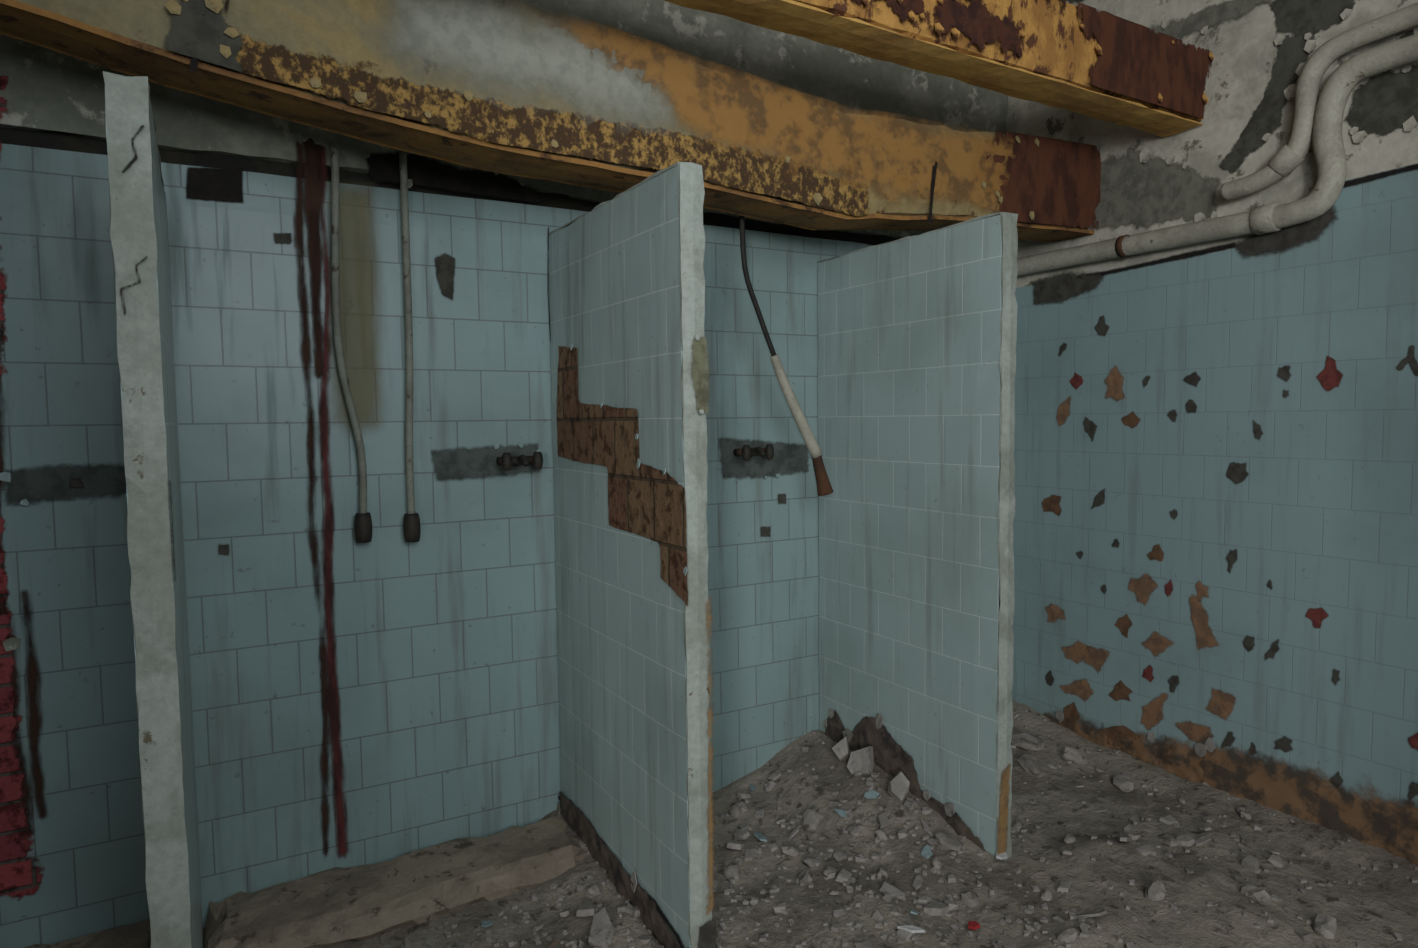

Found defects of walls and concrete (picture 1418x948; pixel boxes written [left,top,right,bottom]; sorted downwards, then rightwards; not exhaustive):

peeling [1344,64,1418,143]
peeling [1056,373,1097,441]
peeling [1105,367,1140,428]
peeling [1167,372,1201,422]
peeling [1317,356,1343,391]
peeling [431,343,688,606]
peeling [1226,462,1249,484]
peeling [1042,495,1061,516]
peeling [1128,545,1173,605]
peeling [1189,581,1219,650]
peeling [1306,608,1329,628]
flaking render [1044,615,1418,866]